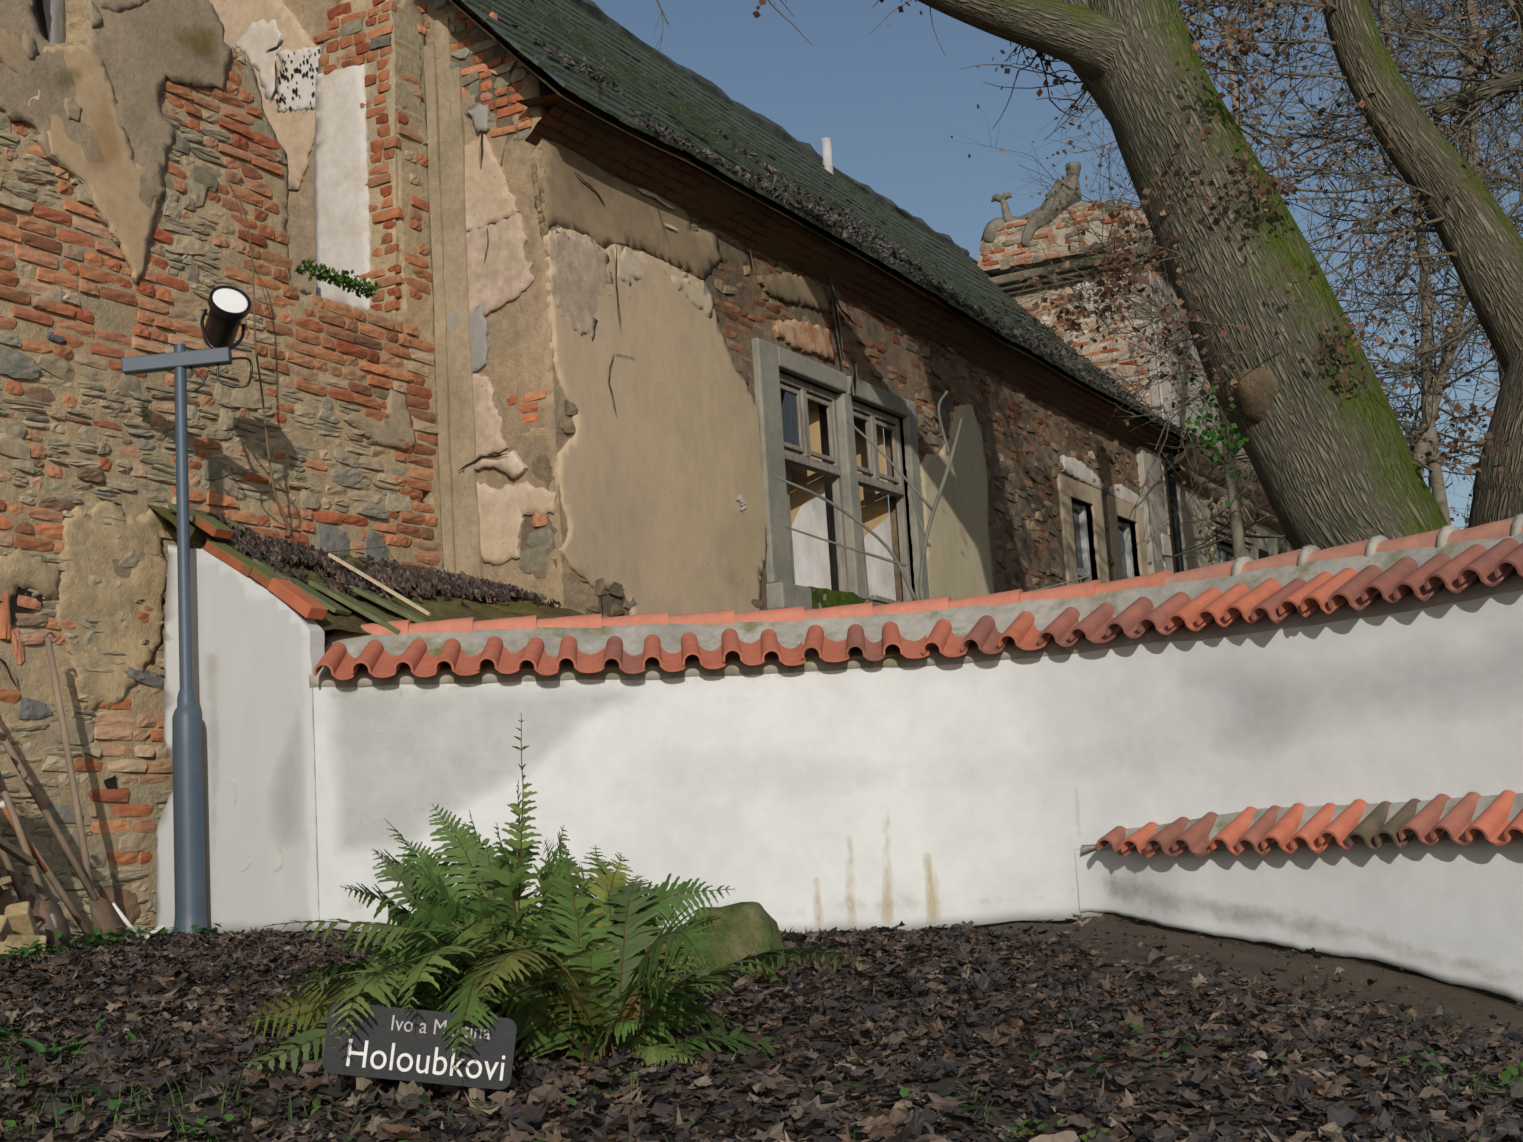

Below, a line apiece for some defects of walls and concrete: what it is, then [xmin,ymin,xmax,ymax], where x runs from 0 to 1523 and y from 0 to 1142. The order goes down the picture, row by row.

flaking render [0,0,321,282]
flaking render [343,389,417,450]
flaking render [427,1,1144,618]